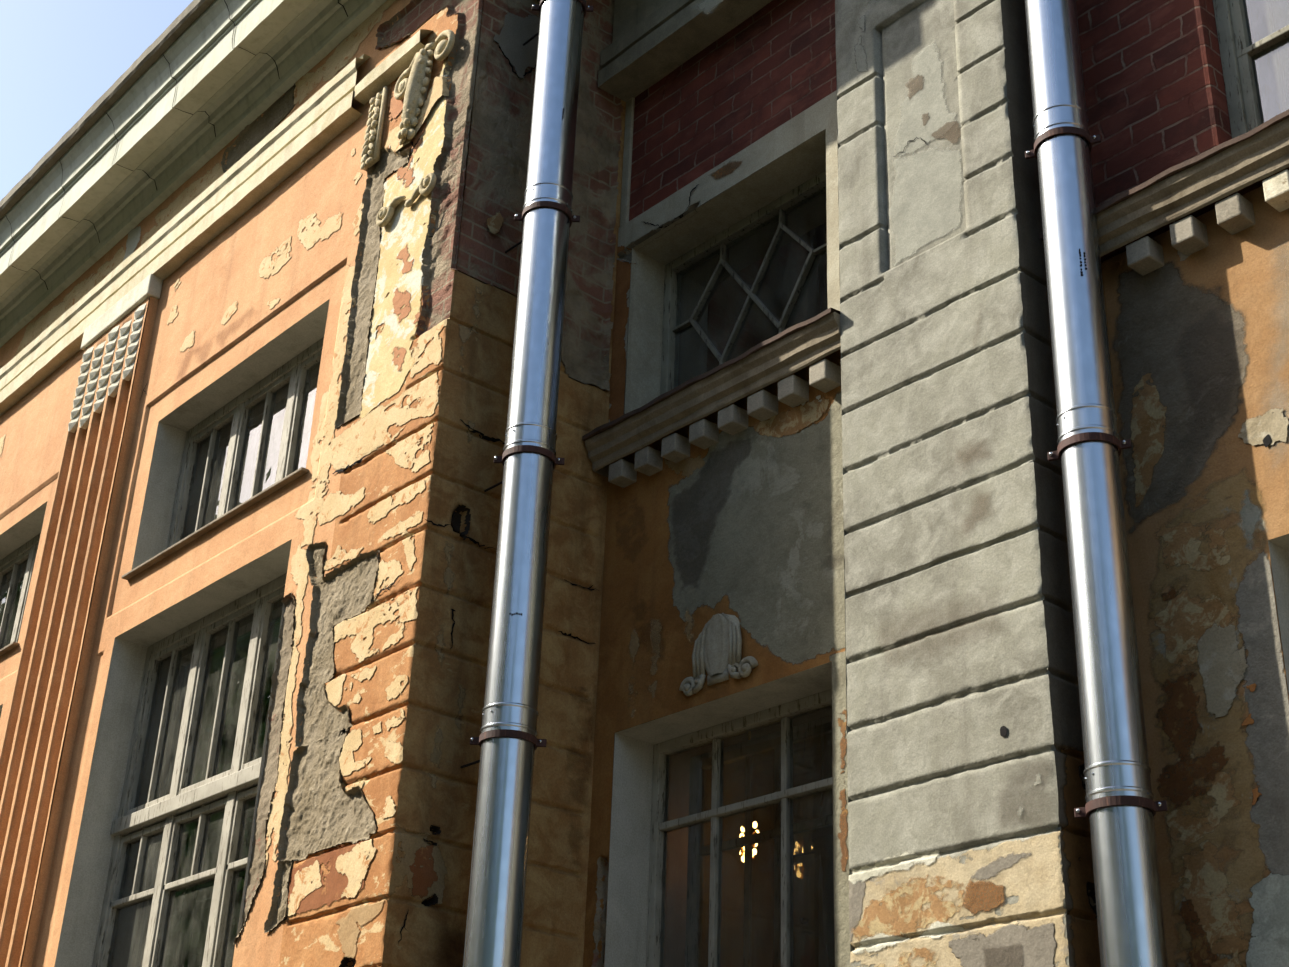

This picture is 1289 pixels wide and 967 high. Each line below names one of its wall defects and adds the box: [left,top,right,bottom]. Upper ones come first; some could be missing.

flaking render [561,0,699,422]
crack [643,184,699,228]
flaking render [13,0,541,944]
crack [425,519,495,549]
peeling [753,395,829,438]
peeling [1130,373,1167,507]
peeling [1238,408,1289,446]
peeling [1149,469,1266,967]
peeling [838,709,1101,967]